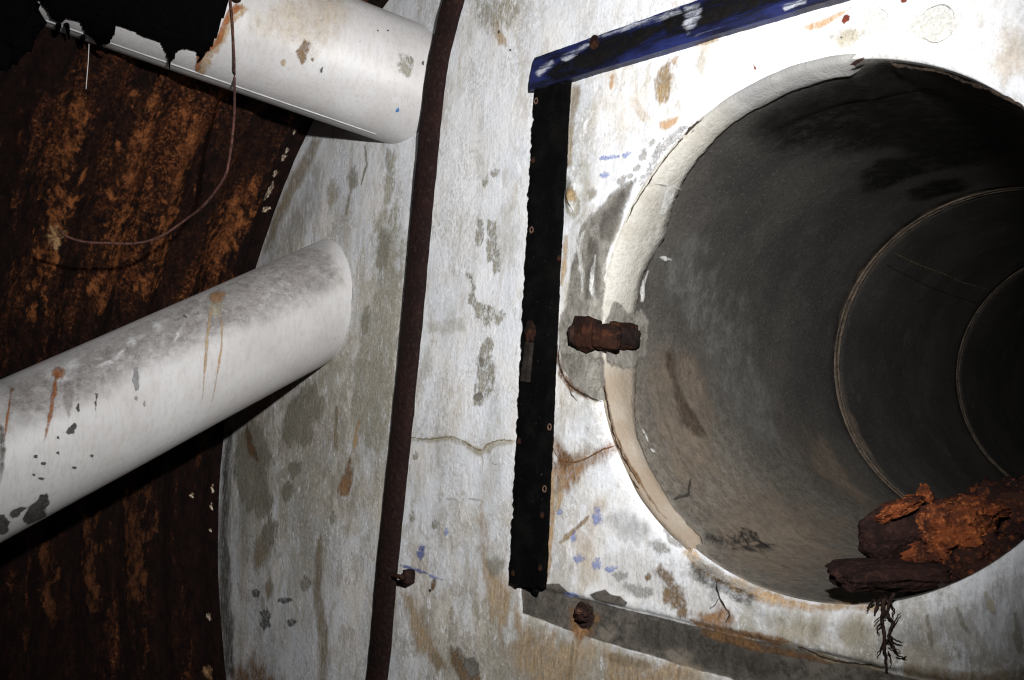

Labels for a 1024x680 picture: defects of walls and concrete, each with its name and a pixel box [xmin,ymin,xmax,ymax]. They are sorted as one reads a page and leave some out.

rust [195,4,247,74]
damp [567,87,579,166]
rust [18,91,95,322]
rust [86,89,211,315]
rust [193,175,259,284]
rust [46,358,78,433]
crack [411,436,513,470]
crack [552,345,691,549]
damp [219,431,273,680]
damp [301,538,328,680]
rust [690,619,790,646]
rust [866,494,999,565]